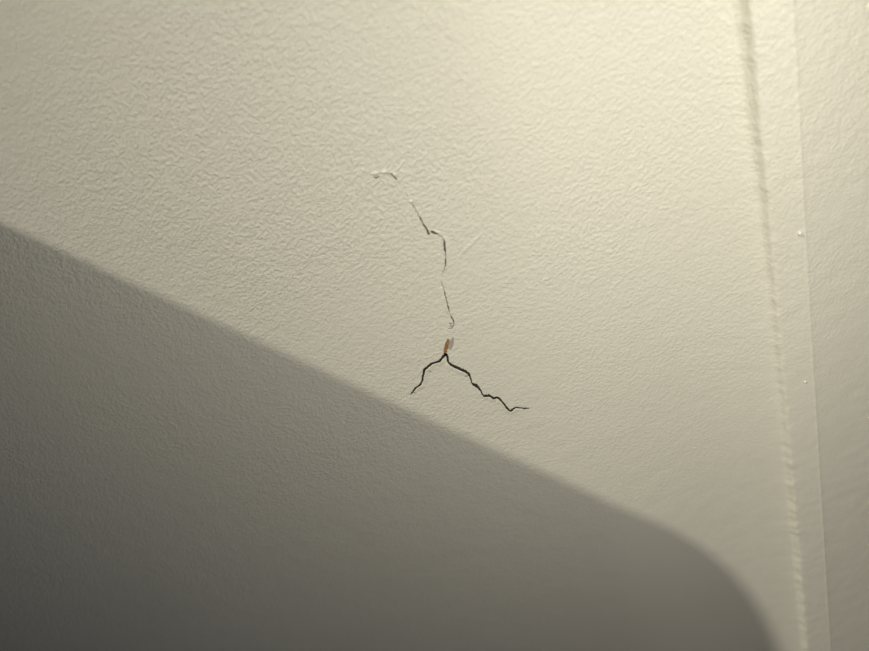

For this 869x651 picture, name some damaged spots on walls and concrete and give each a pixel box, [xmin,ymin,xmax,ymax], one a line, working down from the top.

crack [408,200,529,415]